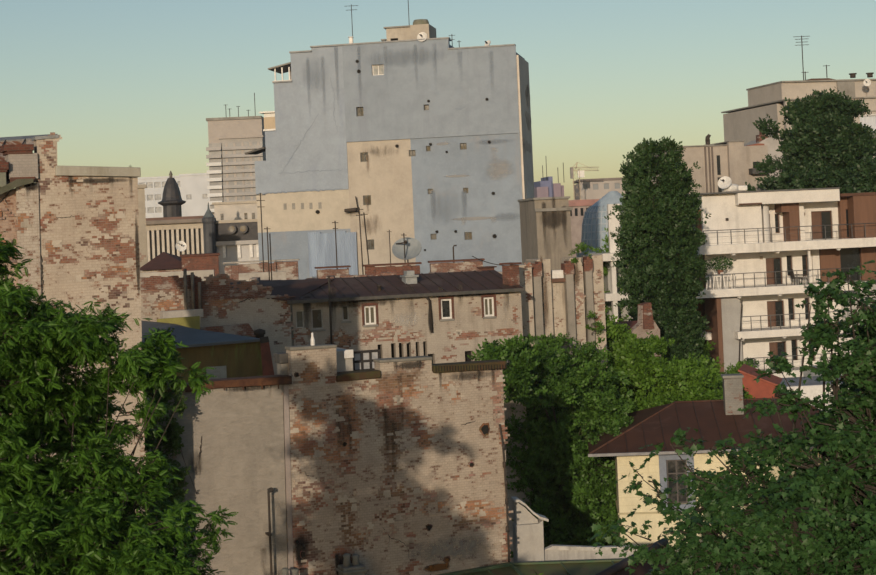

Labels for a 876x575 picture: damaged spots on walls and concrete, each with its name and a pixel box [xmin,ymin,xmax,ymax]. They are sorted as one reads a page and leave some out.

crack [256,115,343,194]
flaking render [0,200,191,316]
flaking render [201,274,314,346]
flaking render [325,319,424,349]
flaking render [441,262,533,361]
flaking render [281,360,513,575]